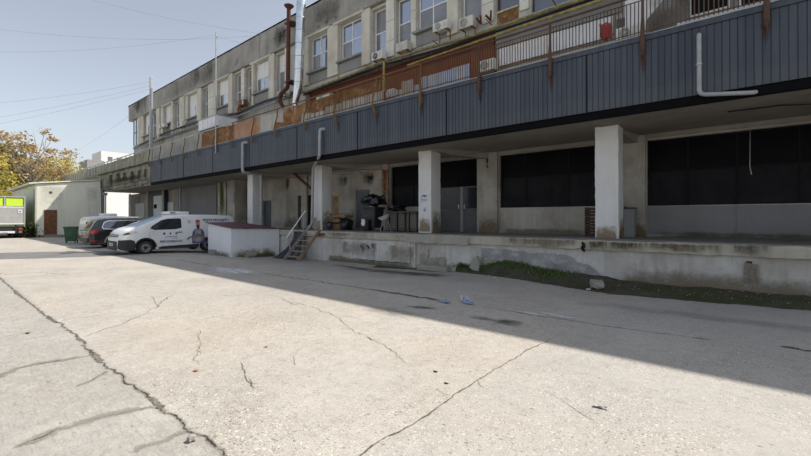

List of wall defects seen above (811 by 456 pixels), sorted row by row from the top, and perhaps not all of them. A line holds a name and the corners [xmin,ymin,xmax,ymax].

crack [0,274,227,456]